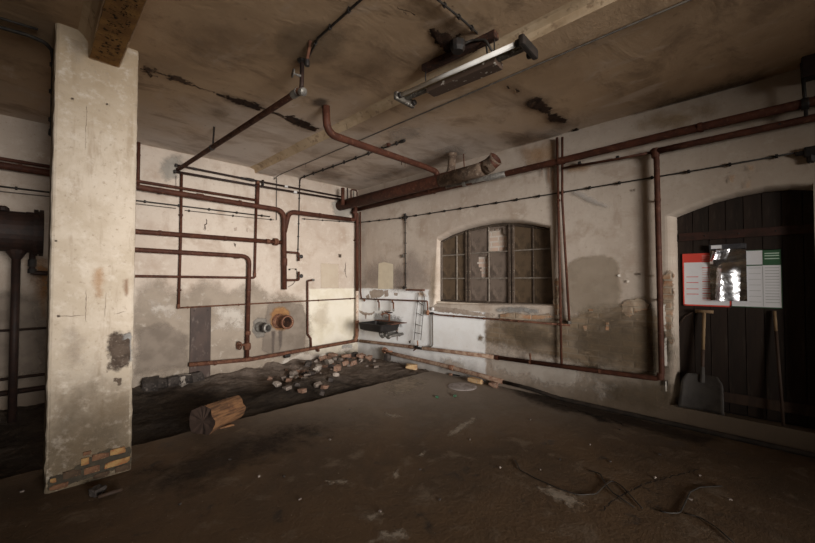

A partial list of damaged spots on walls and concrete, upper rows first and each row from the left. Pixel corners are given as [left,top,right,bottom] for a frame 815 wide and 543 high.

crack [140,65,286,117]
spalling [526,97,568,123]
water stain [568,256,621,312]
water stain [134,282,308,379]
spalling [434,270,675,373]
peeling [107,332,132,386]
spalling [48,446,132,491]